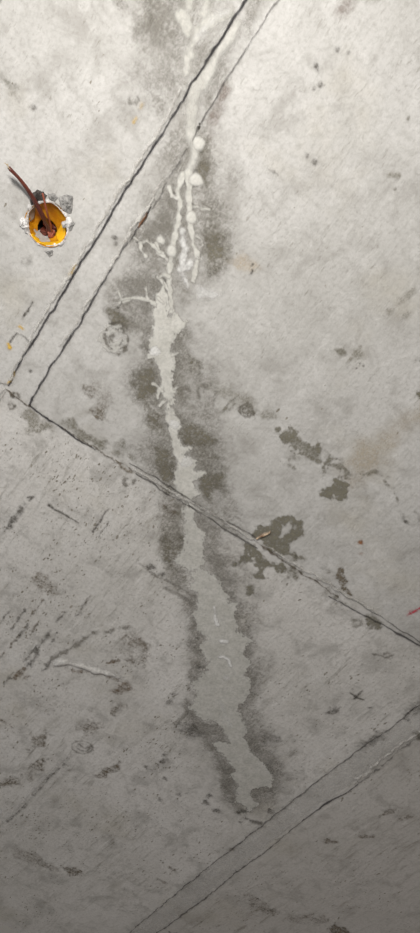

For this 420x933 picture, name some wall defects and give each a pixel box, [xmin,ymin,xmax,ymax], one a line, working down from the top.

damp [171,131,213,193]
damp [113,209,228,333]
damp [132,358,162,429]
damp [148,445,178,493]
damp [172,380,223,498]
damp [160,535,184,566]